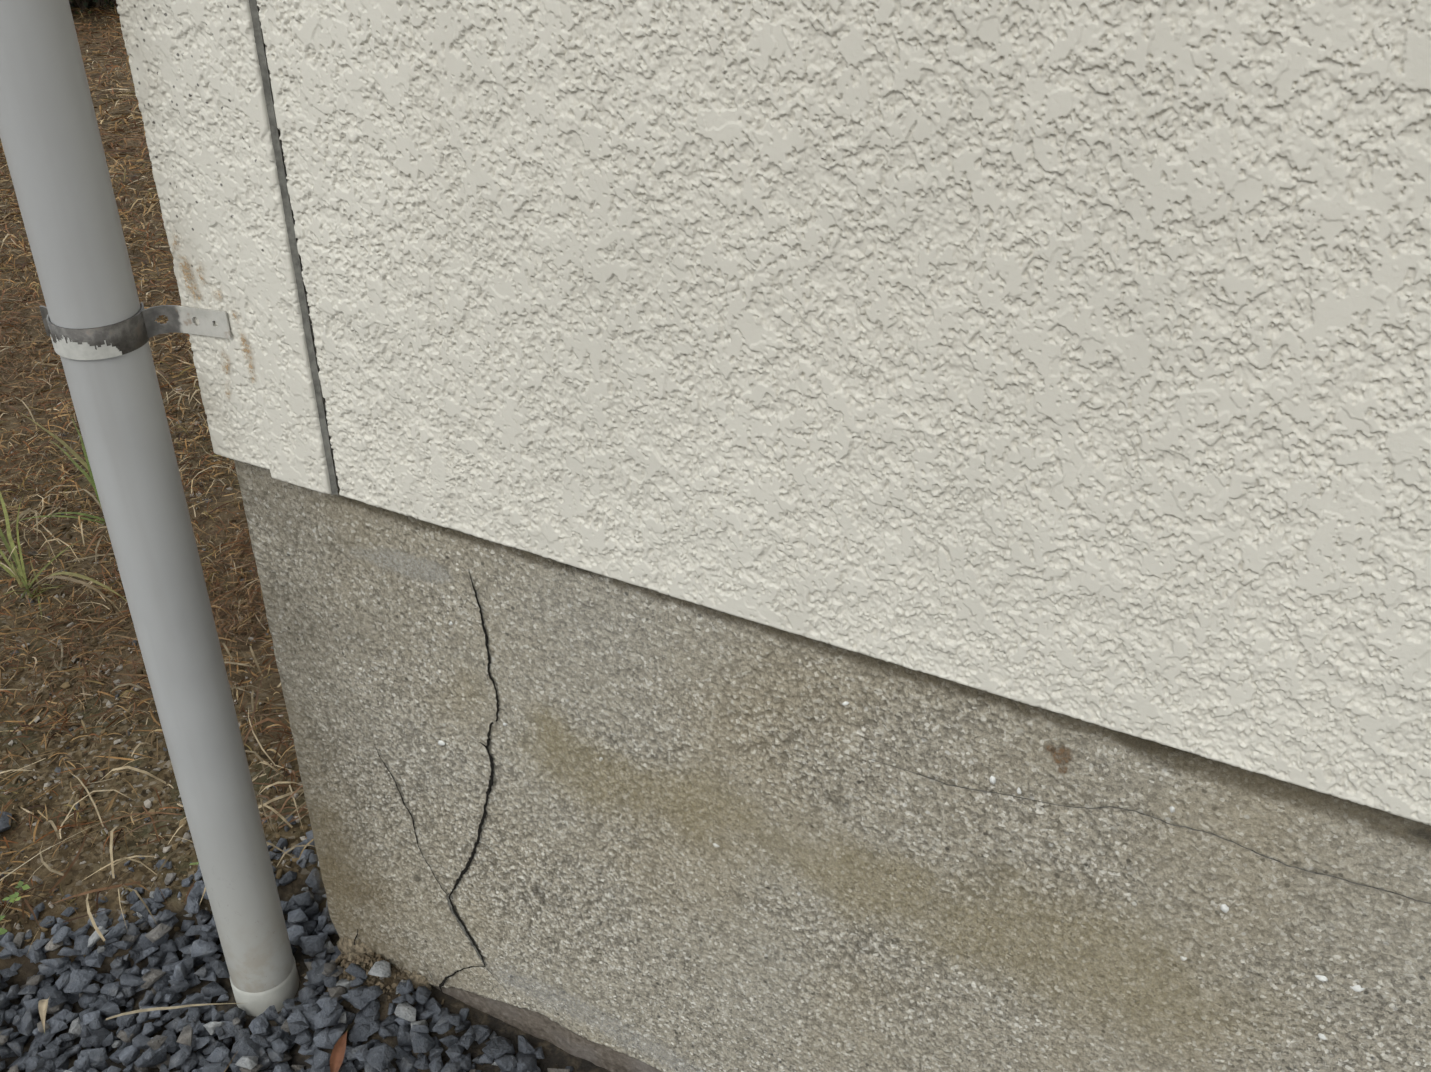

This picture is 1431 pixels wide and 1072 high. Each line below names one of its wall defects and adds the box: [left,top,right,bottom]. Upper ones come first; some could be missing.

crack [374,571,507,994]
corrosion [1046,745,1071,773]
crack [870,759,1431,904]